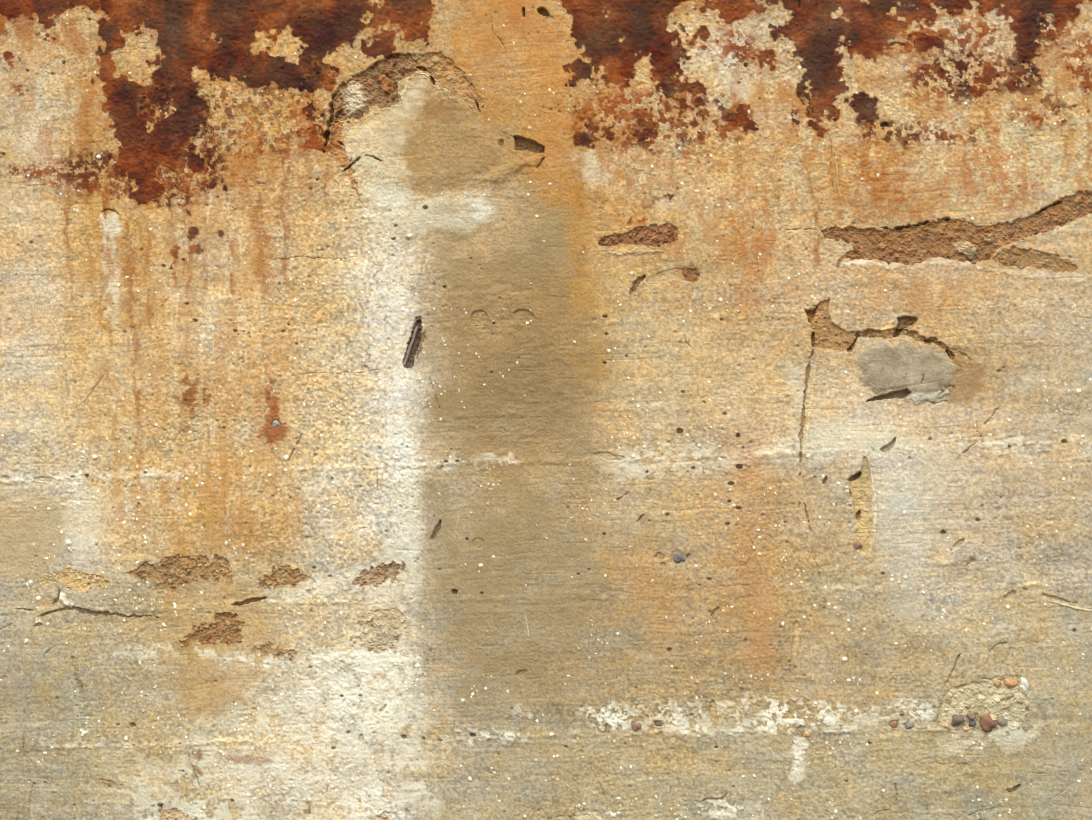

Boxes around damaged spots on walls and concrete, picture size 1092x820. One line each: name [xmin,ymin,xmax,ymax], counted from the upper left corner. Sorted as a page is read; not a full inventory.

spalling [328,52,485,199]
rust [0,0,1092,572]
spalling [598,223,680,257]
spalling [629,265,701,295]
spalling [785,190,1092,274]
spalling [805,299,972,362]
spalling [41,553,234,595]
rust [137,570,305,725]
spalling [179,611,300,663]
spalling [351,561,407,590]
rust [592,530,699,676]
rust [680,376,795,703]